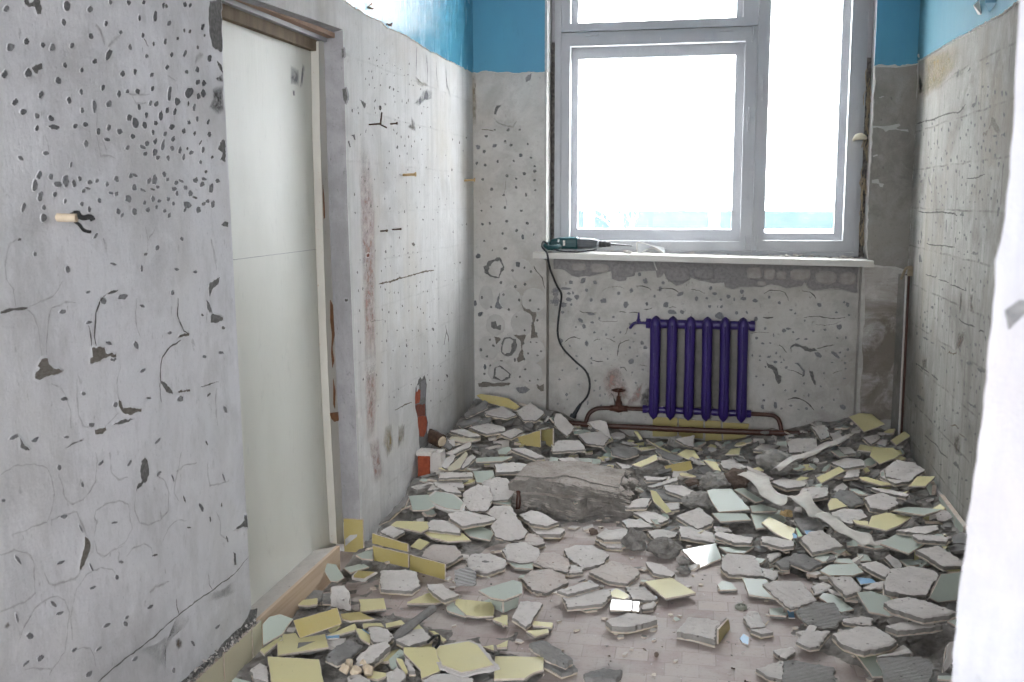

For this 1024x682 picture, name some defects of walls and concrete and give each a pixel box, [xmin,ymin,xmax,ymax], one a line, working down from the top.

crack [380,270,434,284]
spalling [452,128,545,410]
crack [1,306,27,314]
crack [89,296,105,346]
crack [959,300,1024,332]
spalling [33,355,64,383]
spalling [88,341,117,366]
crack [160,304,188,399]
spalling [386,279,512,485]
spalling [551,253,860,472]
spalling [126,455,175,492]
crack [99,558,248,681]